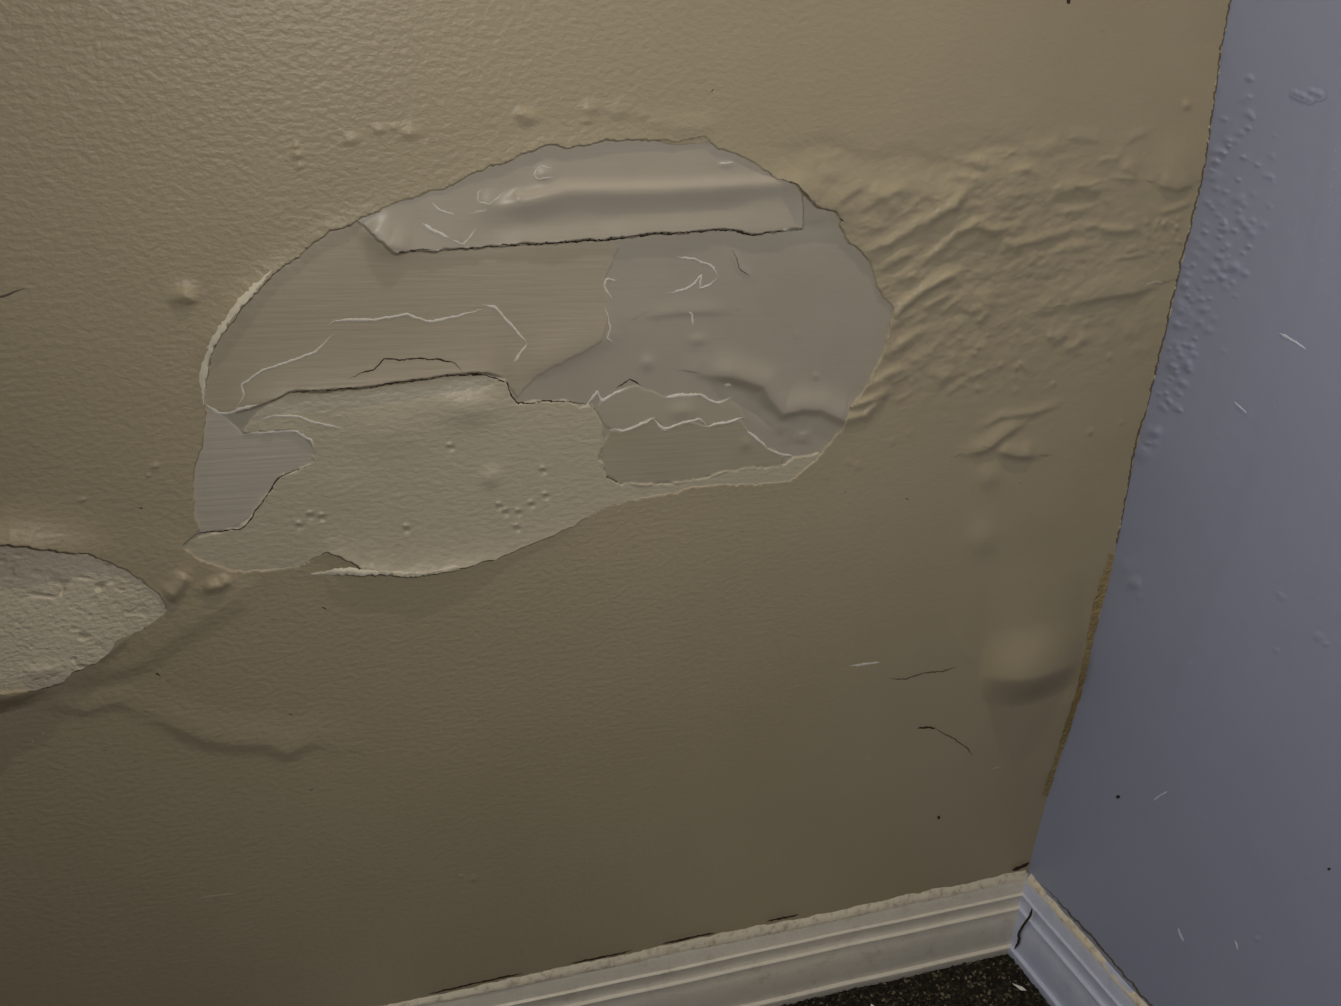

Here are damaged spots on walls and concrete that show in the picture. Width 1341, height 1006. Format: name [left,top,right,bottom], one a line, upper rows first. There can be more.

spalling [0,544,168,695]
peeling [142,98,894,625]